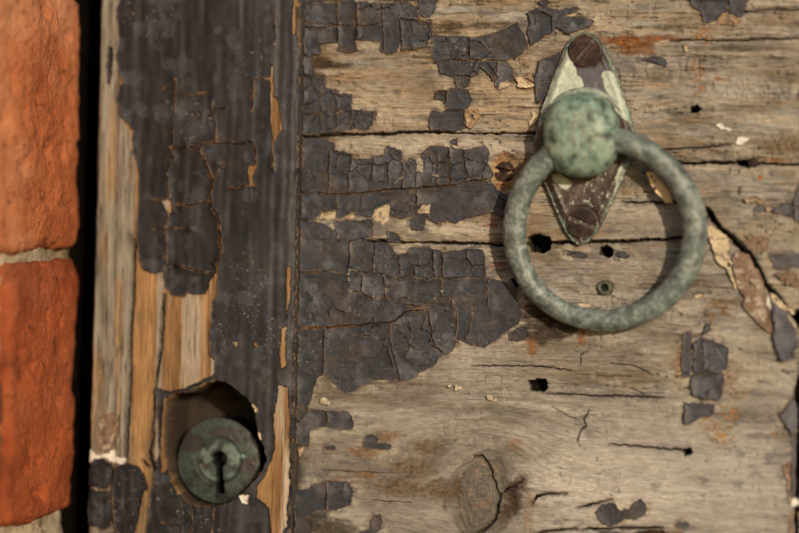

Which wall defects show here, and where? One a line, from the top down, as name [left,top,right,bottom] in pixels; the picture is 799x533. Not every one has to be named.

crack [152,80,257,274]
peeling [745,188,799,221]
peeling [88,0,594,533]
peeling [770,254,799,270]
peeling [766,293,798,361]
crack [478,455,519,533]
crack [540,525,658,533]
peeling [596,499,647,533]
crack [609,443,685,451]
peeling [781,399,799,533]